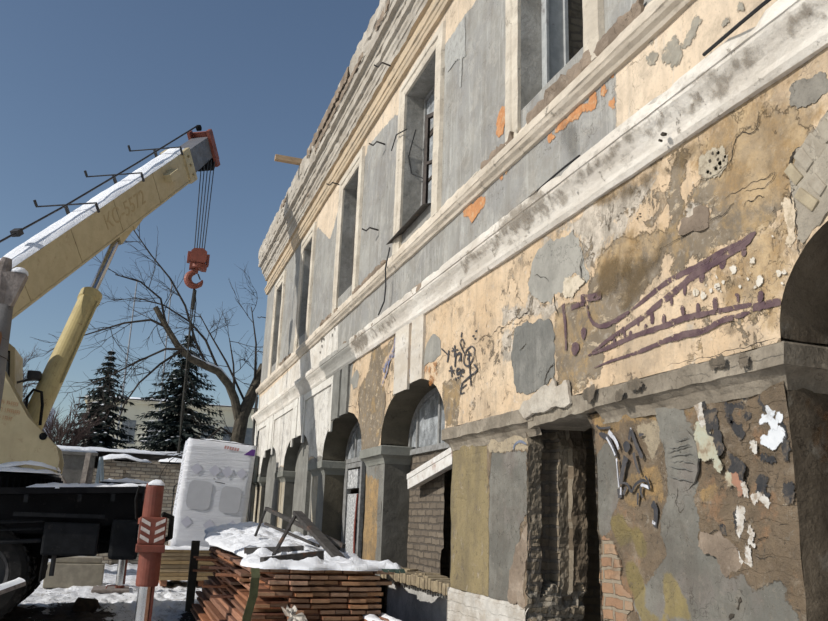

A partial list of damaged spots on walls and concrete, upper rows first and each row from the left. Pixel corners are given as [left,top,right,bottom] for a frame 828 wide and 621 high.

spalling [526,0,644,124]
spalling [646,15,702,71]
spalling [463,196,486,223]
spalling [480,106,514,169]
spalling [547,74,615,143]
spalling [698,146,729,180]
crack [710,147,800,254]
spalling [781,110,828,247]
peeling [562,274,585,299]
peeling [693,394,791,578]
spalling [507,525,531,609]
spalling [599,535,634,621]